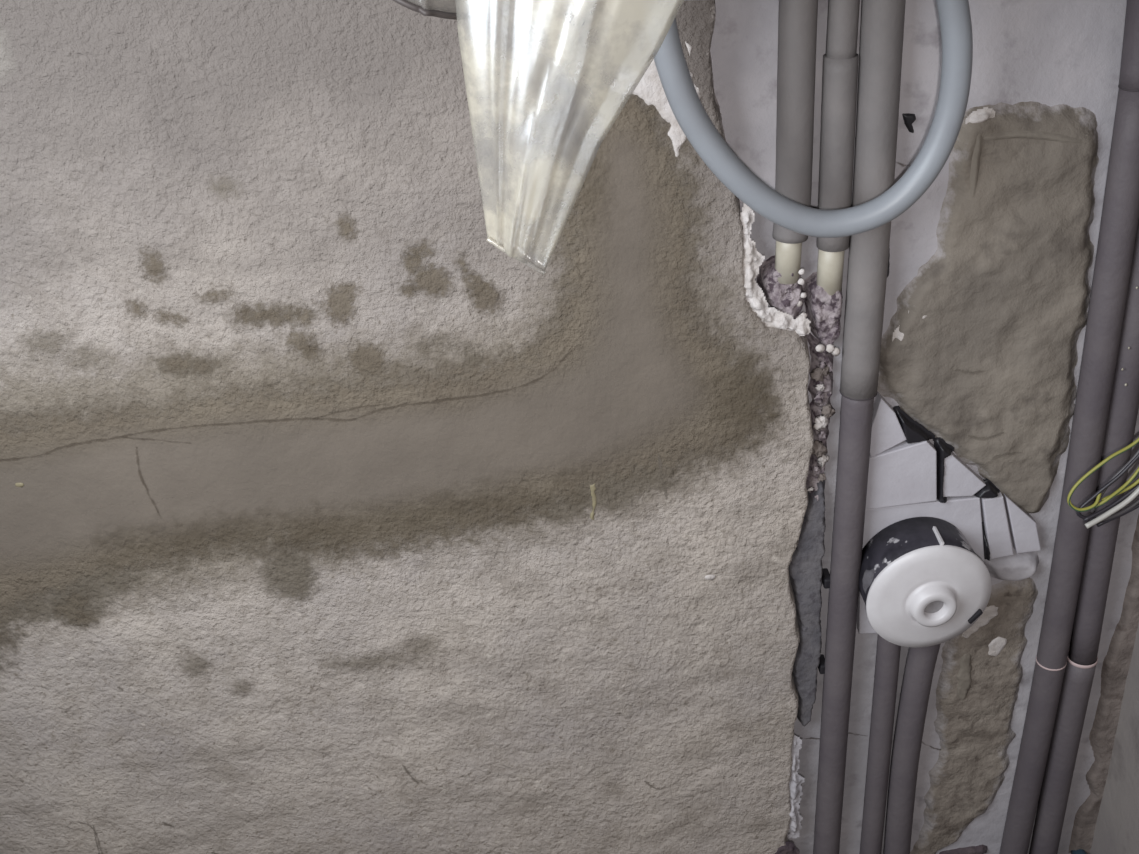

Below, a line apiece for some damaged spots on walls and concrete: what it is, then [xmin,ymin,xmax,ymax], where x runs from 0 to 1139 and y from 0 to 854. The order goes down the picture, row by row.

spalling [902,113,916,133]
peeling [965,107,995,124]
crack [0,350,572,512]
damp [0,73,777,645]
spalling [740,203,840,854]
peeling [962,605,998,638]
peeling [988,637,1007,657]
flaking render [1068,515,1139,854]